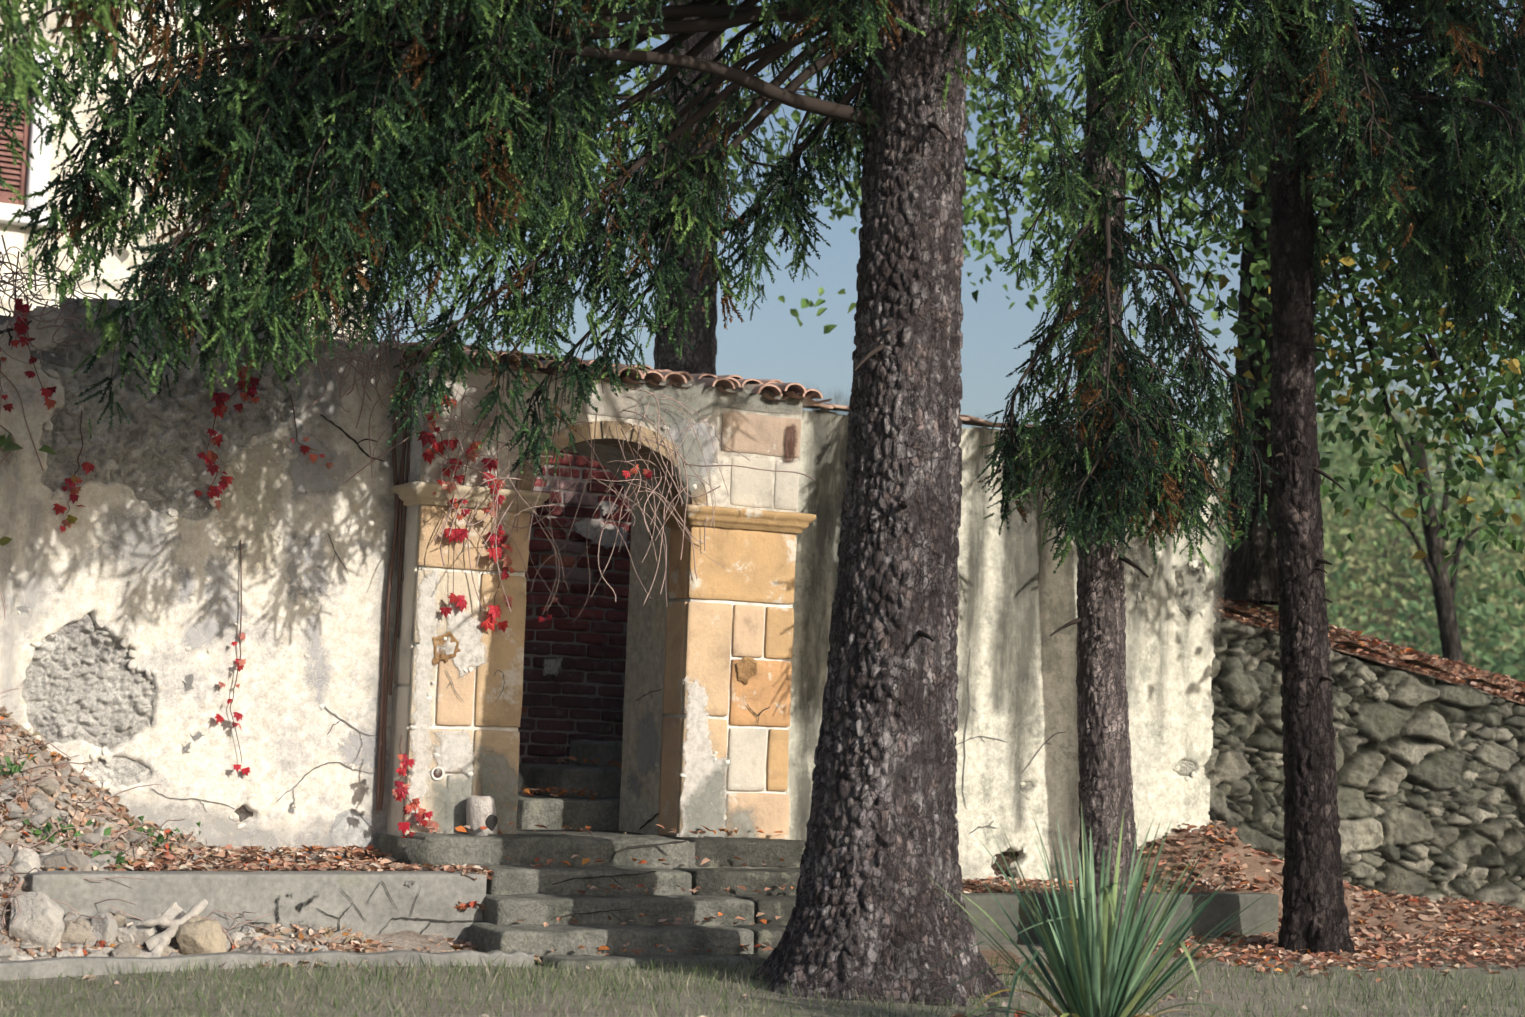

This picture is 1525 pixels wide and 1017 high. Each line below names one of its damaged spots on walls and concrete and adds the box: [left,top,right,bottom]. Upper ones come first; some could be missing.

spalling [22,612,155,789]
spalling [31,298,325,710]
flaking render [408,569,486,825]
damp [959,679,971,724]
damp [963,425,988,649]
damp [995,428,1049,823]